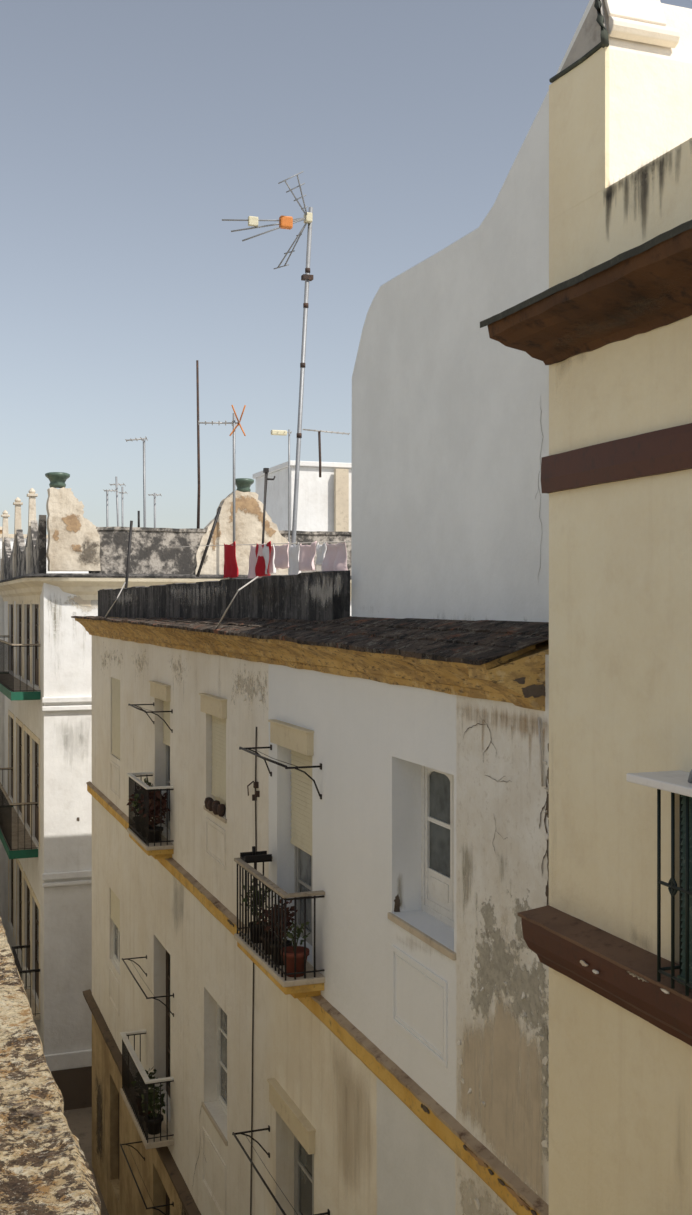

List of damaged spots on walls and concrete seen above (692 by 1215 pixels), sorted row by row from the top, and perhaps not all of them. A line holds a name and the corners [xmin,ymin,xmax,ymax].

water stain [606,162,671,220]
spalling [53,514,82,552]
crack [463,716,512,782]
crack [539,784,549,905]
peeling [469,888,549,1161]
spalling [463,1144,537,1215]